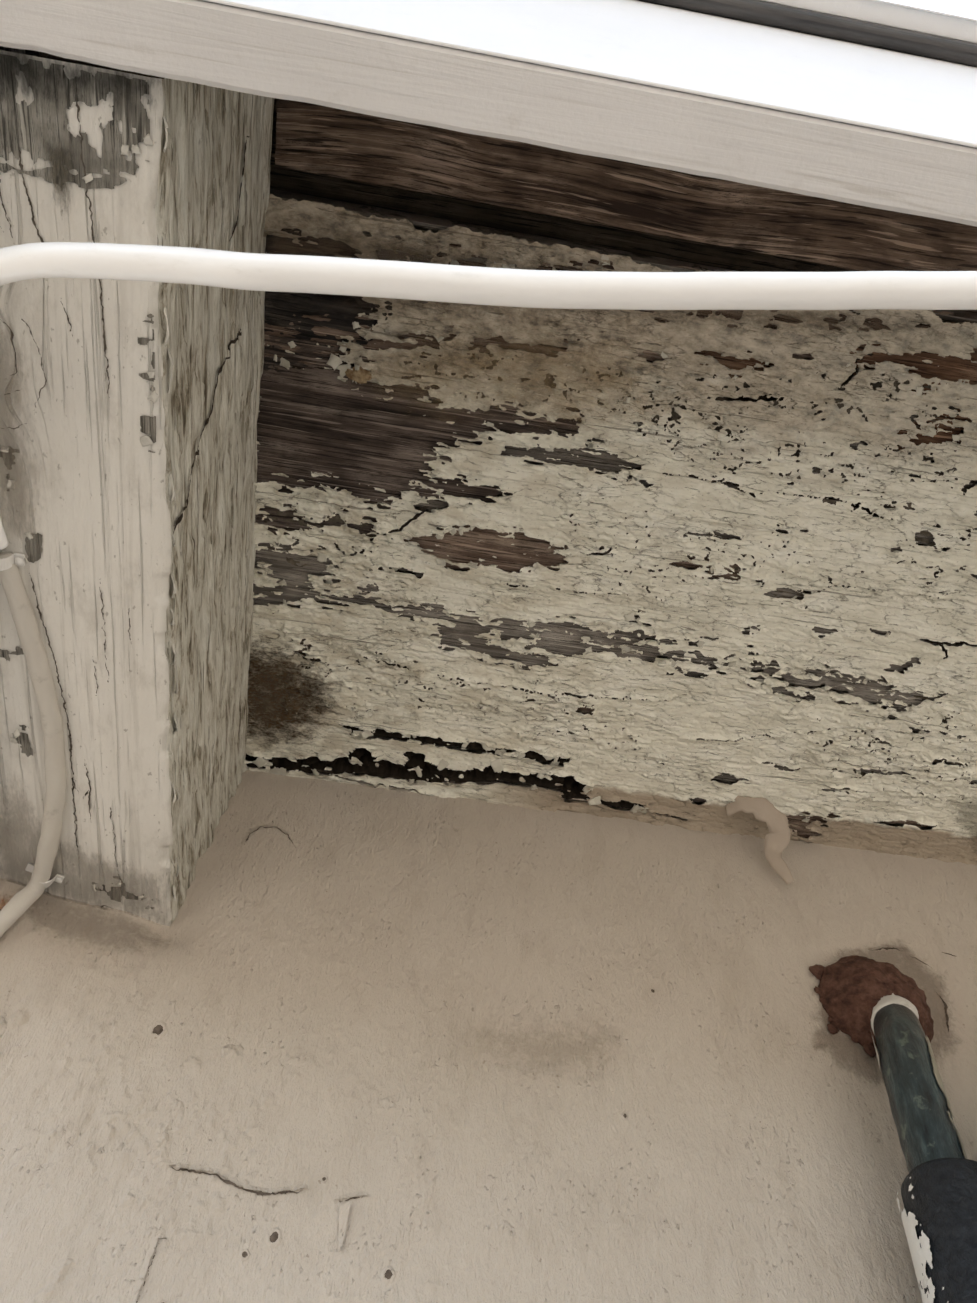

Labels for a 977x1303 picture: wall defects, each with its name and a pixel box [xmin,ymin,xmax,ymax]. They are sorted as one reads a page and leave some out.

water stain [0,49,151,103]
peeling [0,54,168,191]
water stain [49,147,73,195]
peeling [265,228,517,268]
peeling [535,254,615,271]
peeling [137,307,174,453]
peeling [253,291,977,738]
peeling [25,530,43,563]
water stain [247,641,333,746]
spalling [245,724,676,818]
peeling [786,811,838,839]
crack [169,1162,370,1201]